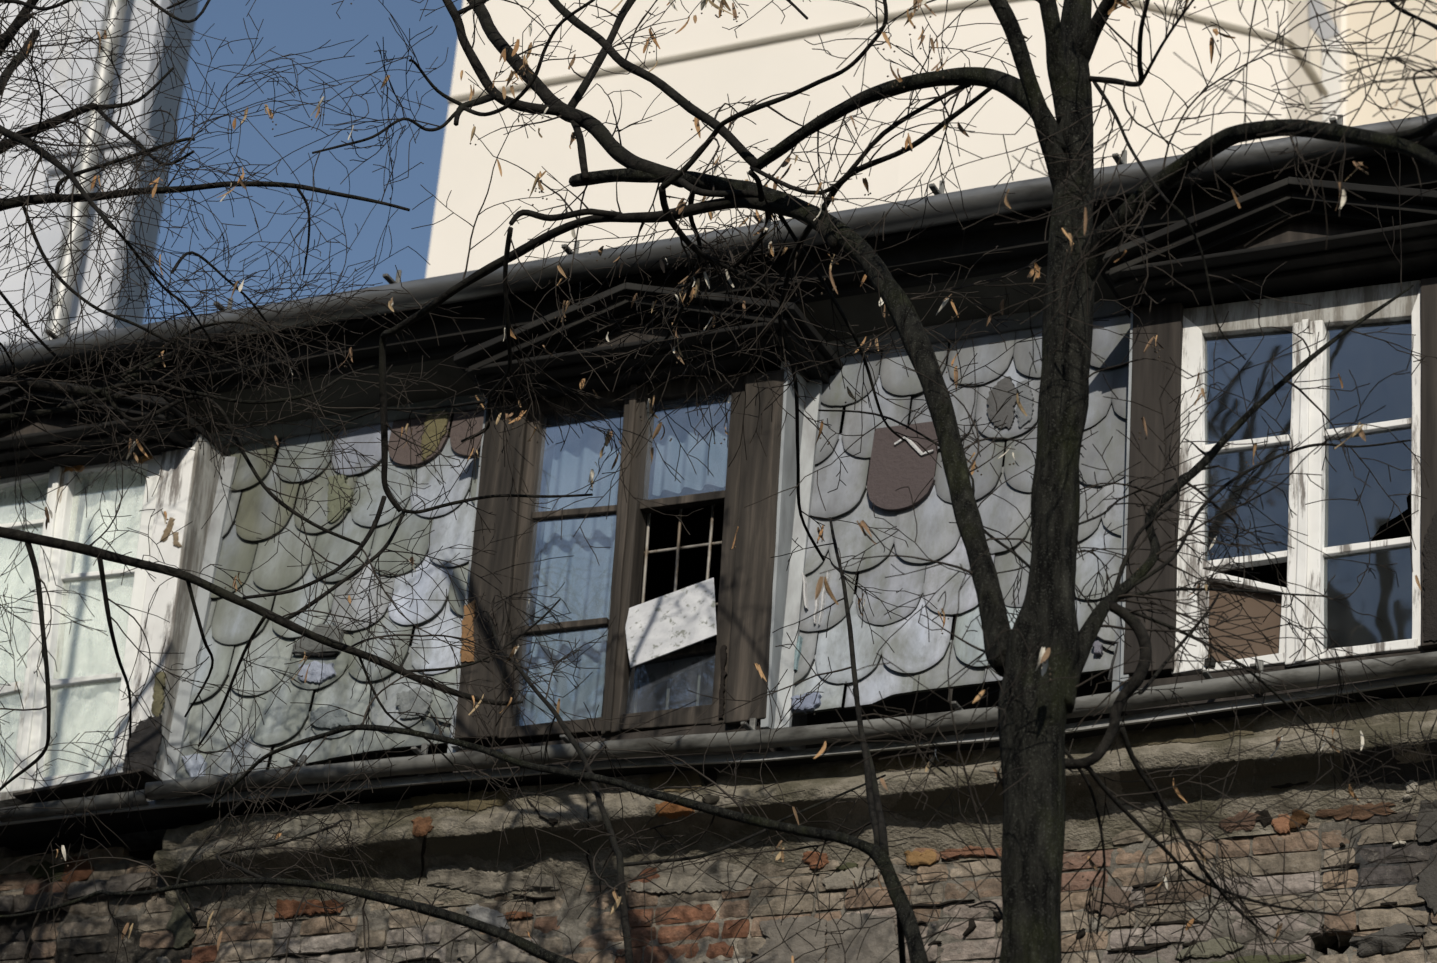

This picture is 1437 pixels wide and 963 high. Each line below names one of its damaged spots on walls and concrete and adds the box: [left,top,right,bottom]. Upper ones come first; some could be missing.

spalling [1219,809,1310,834]
spalling [1320,940,1350,955]